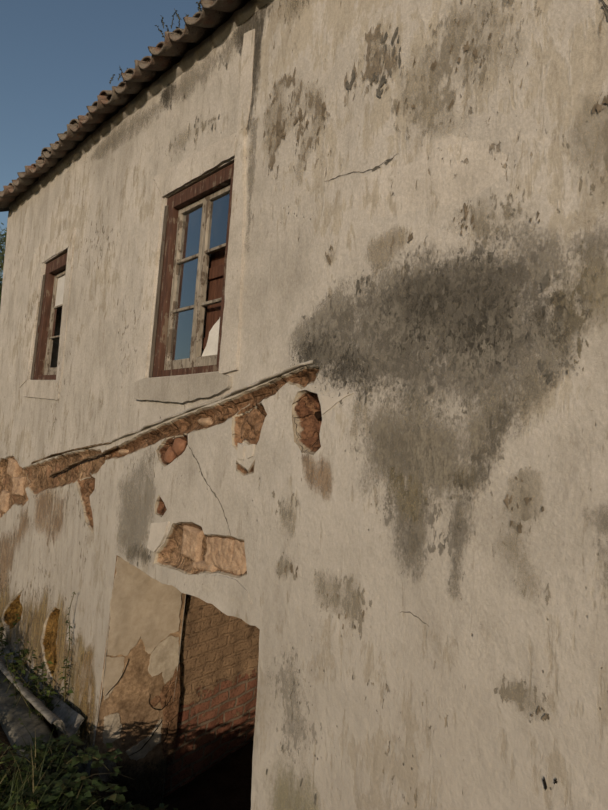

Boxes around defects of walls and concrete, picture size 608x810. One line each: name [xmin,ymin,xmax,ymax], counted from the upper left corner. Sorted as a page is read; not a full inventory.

crack [600,0,608,21]
flaking render [0,366,354,535]
leakage [290,208,608,597]
flaking render [1,590,23,631]
flaking render [41,606,60,679]
flaking render [147,495,252,604]
peeling [277,557,298,580]
flaking render [112,639,180,756]